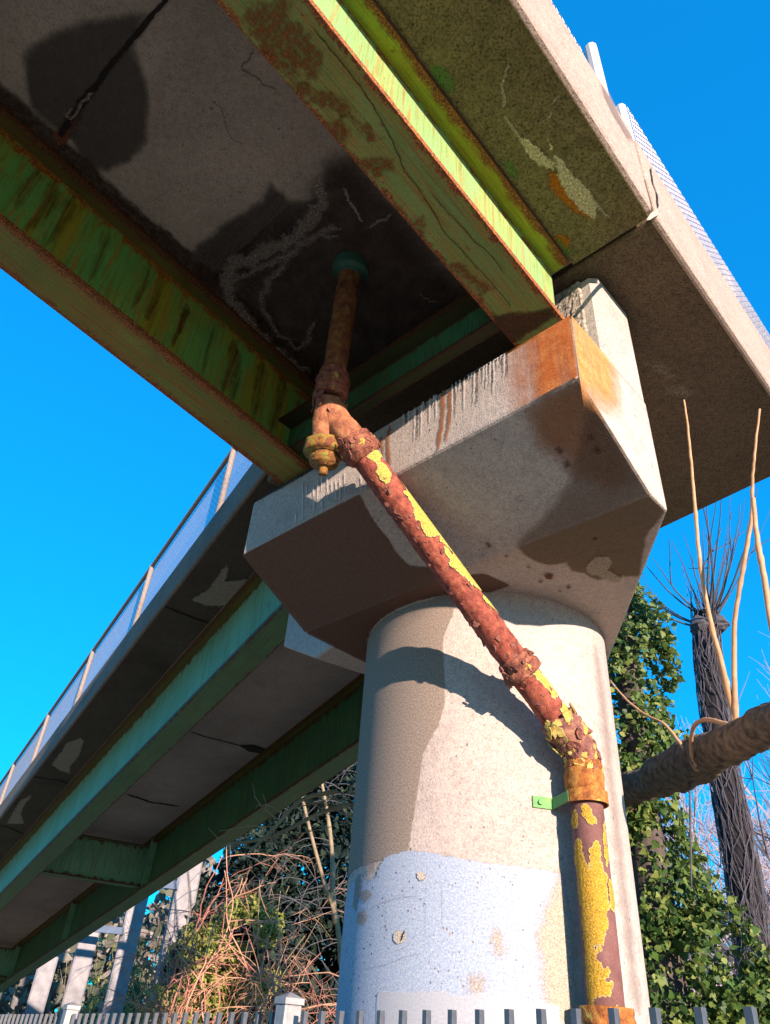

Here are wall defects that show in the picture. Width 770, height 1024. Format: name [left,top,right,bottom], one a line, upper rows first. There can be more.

crack [53,0,169,146]
damp [192,160,467,372]
damp [403,395,437,439]
corrosion [437,388,452,449]
damp [451,352,508,419]
corrosion [495,308,624,484]
corrosion [337,425,449,572]
corrosion [449,591,553,708]
peeling [52,738,85,774]
crack [192,732,265,753]
corrosion [549,708,603,772]
crack [126,794,180,807]